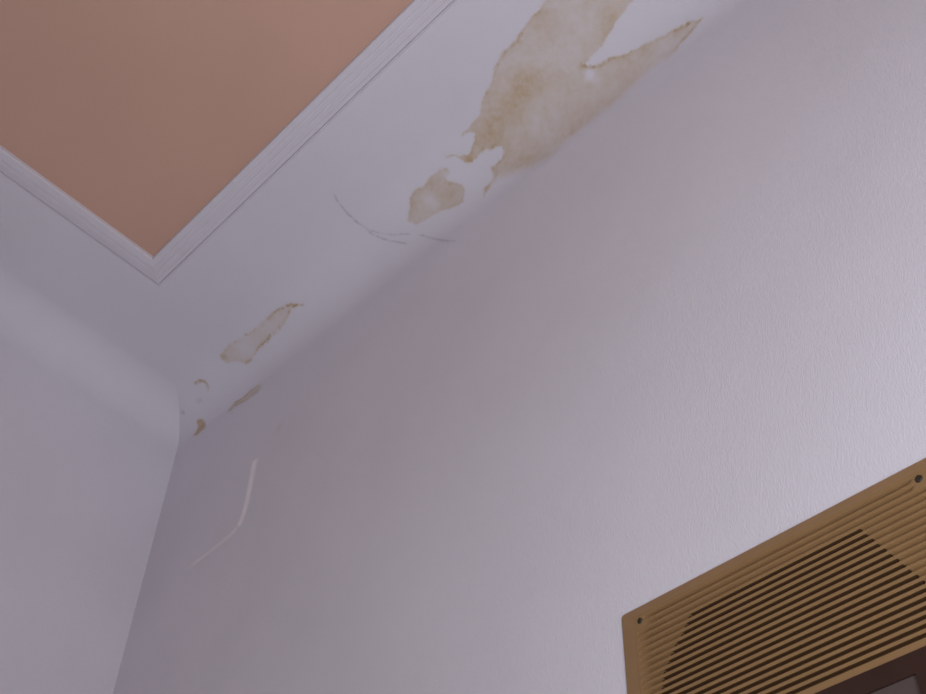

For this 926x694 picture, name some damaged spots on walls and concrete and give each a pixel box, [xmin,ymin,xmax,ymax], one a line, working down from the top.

water stain [405,0,705,226]
water stain [218,301,306,366]